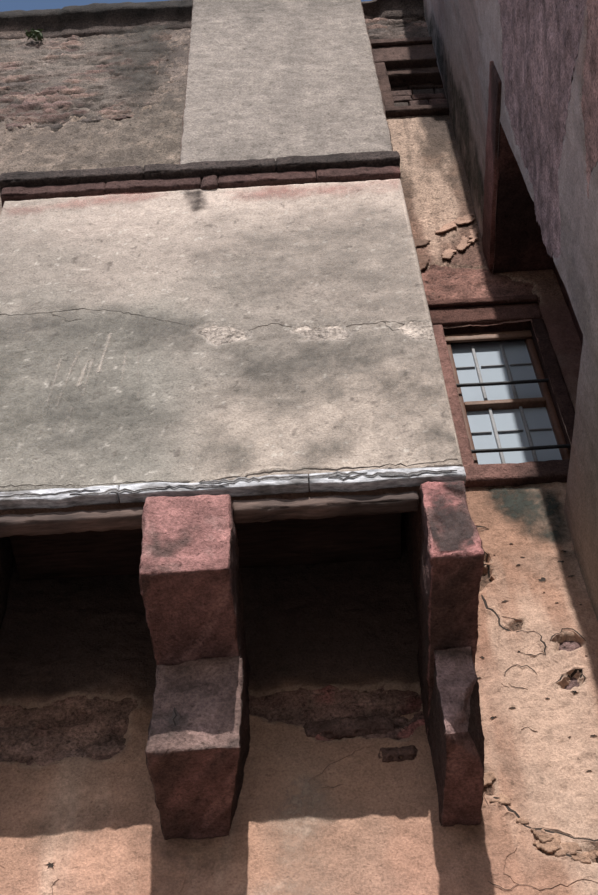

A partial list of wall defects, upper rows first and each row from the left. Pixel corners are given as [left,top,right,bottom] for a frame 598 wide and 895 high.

peeling [414,214,540,305]
crack [0,308,188,326]
crack [475,523,489,532]
crack [478,595,550,690]
spalling [549,627,586,651]
spalling [555,665,589,690]
spalling [248,685,425,740]
crack [483,771,598,892]